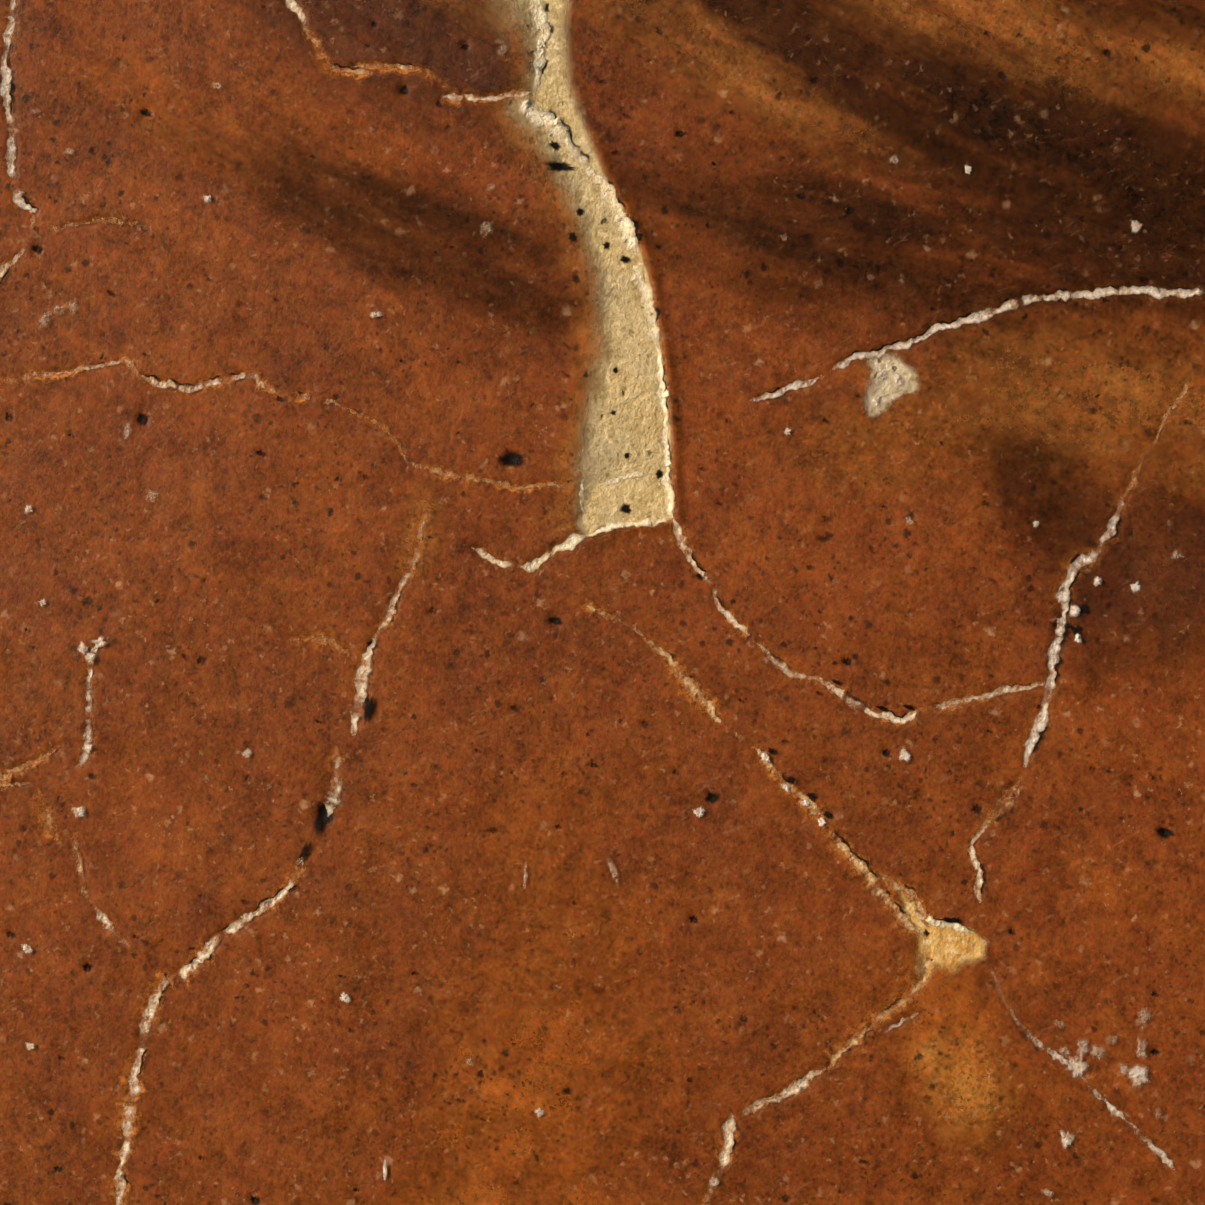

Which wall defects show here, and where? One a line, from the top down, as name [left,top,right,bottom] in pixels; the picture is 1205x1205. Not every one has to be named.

crack [286,0,531,106]
crack [0,0,137,231]
spalling [494,0,674,536]
spalling [867,356,916,415]
crack [755,286,1201,401]
crack [477,534,583,572]
crack [669,520,748,638]
crack [647,641,722,723]
crack [771,386,1187,898]
crack [0,356,556,1205]
crack [699,746,931,1205]
spalling [901,893,986,976]